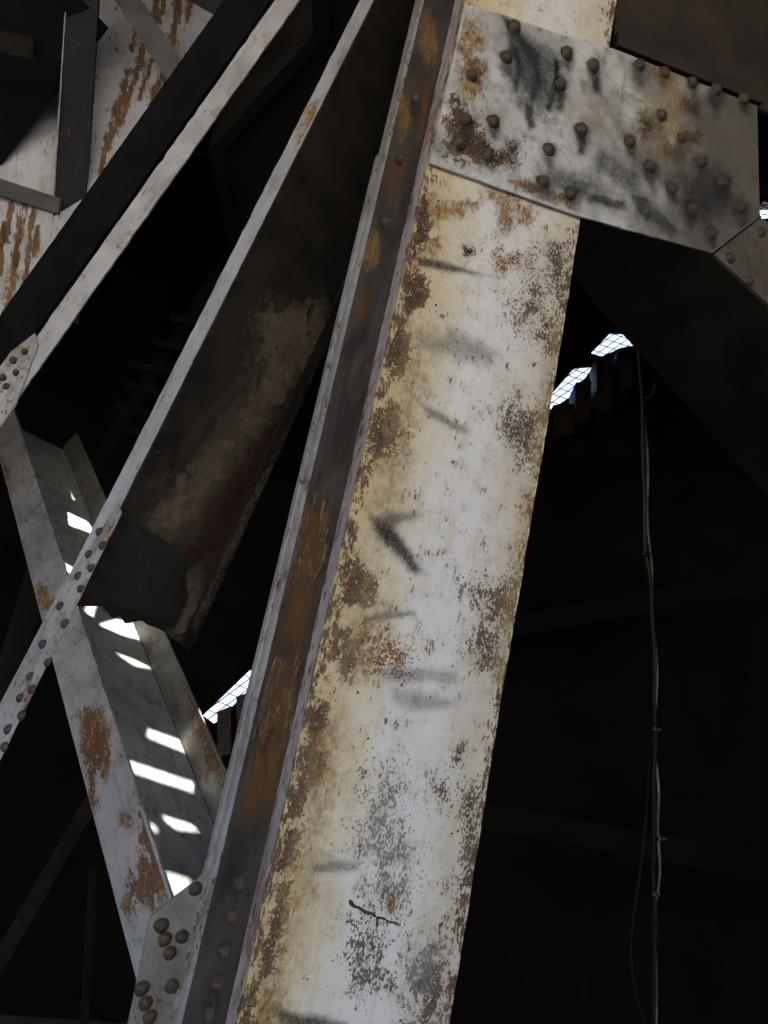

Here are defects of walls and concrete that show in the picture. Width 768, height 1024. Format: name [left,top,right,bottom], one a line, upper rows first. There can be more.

corrosion [457,18,488,100]
corrosion [431,190,476,223]
corrosion [489,179,572,232]
corrosion [483,242,533,287]
corrosion [347,584,423,692]
corrosion [75,699,112,812]
corrosion [120,796,167,922]
crack [349,900,401,927]